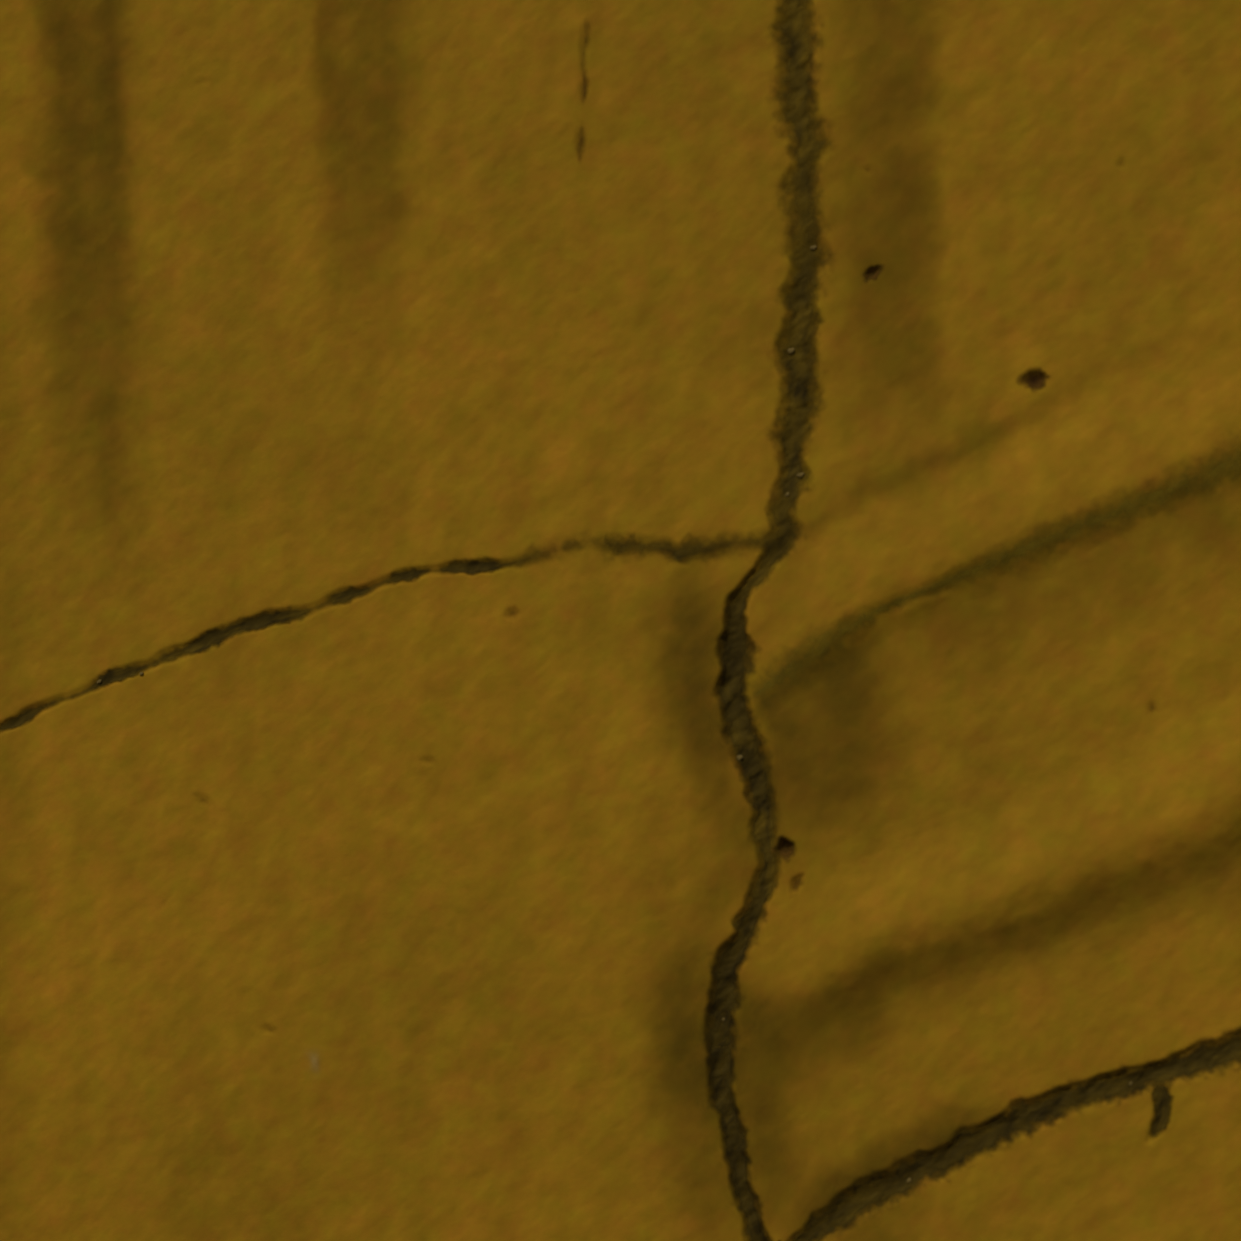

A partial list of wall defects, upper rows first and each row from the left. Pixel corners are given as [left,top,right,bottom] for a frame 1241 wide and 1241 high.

crack [0,544,568,731]
crack [604,0,1241,1241]